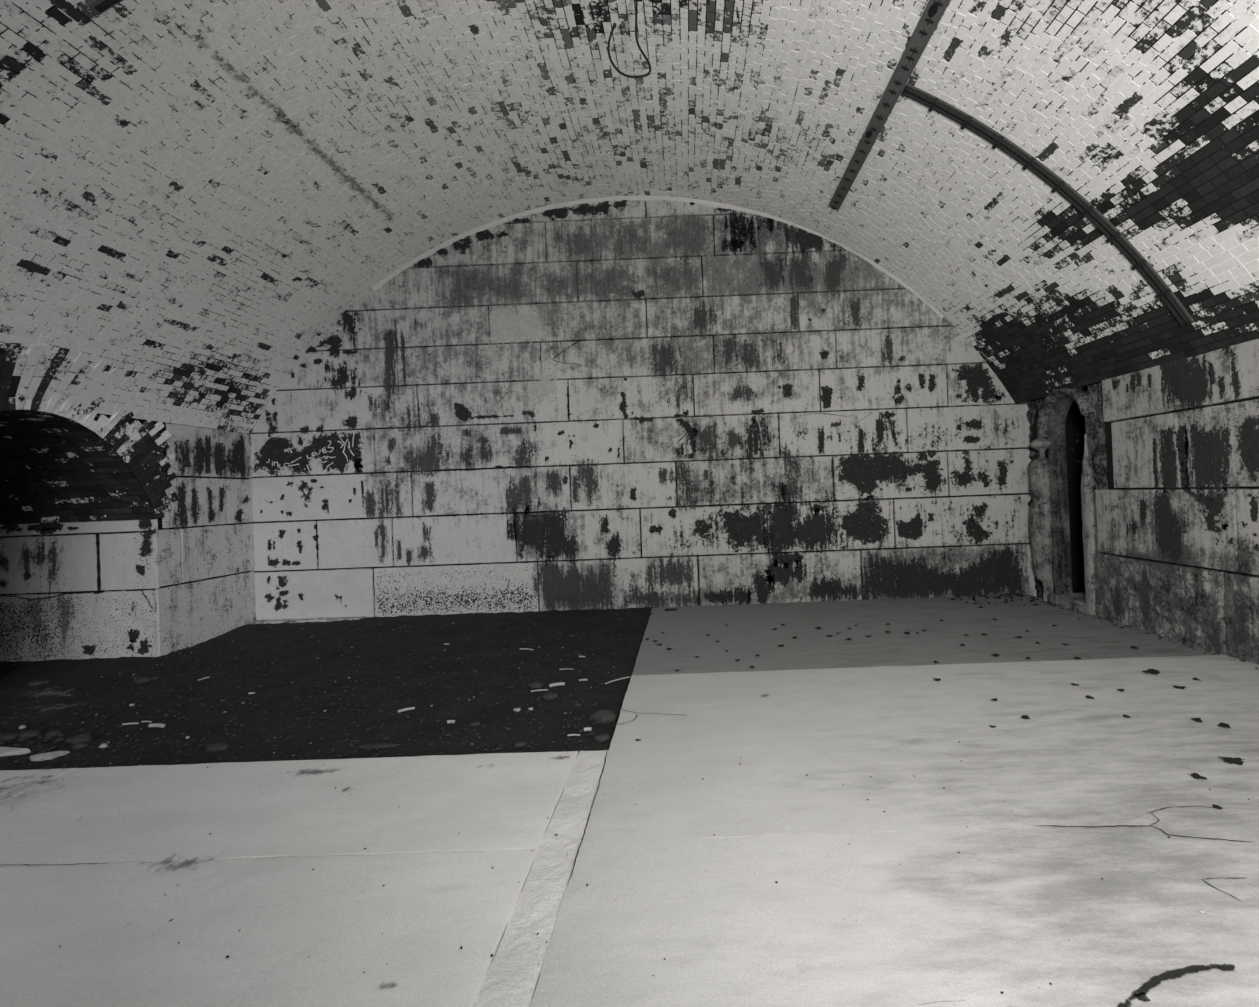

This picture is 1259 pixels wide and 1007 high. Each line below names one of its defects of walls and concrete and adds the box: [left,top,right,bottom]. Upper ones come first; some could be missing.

peeling [1125,55,1259,231]
peeling [1037,205,1087,244]
leakage [383,320,406,409]
leakage [362,467,436,565]
leakage [499,459,600,517]
leakage [658,413,807,511]
leakage [1112,346,1241,565]
leakage [0,536,70,650]
leakage [530,541,1028,611]
leakage [1139,570,1152,621]